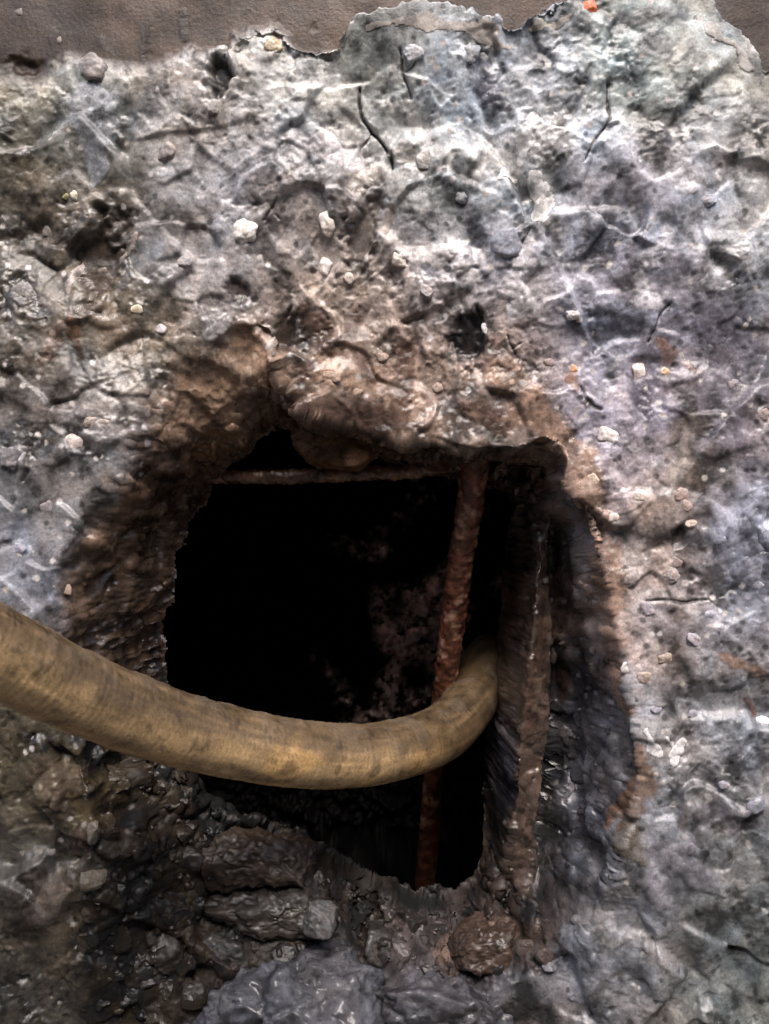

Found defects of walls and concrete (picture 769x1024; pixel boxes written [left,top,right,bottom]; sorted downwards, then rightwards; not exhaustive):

peeling [65,81,121,188]
spalling [213,58,232,98]
crack [358,88,393,170]
crack [585,84,612,159]
spalling [65,209,138,297]
corrosion [284,303,440,442]
spalling [447,307,491,375]
corrosion [455,336,632,716]
corrosion [207,459,490,705]
peeling [643,728,687,767]
corrosion [414,764,447,892]
corrosion [605,746,657,866]